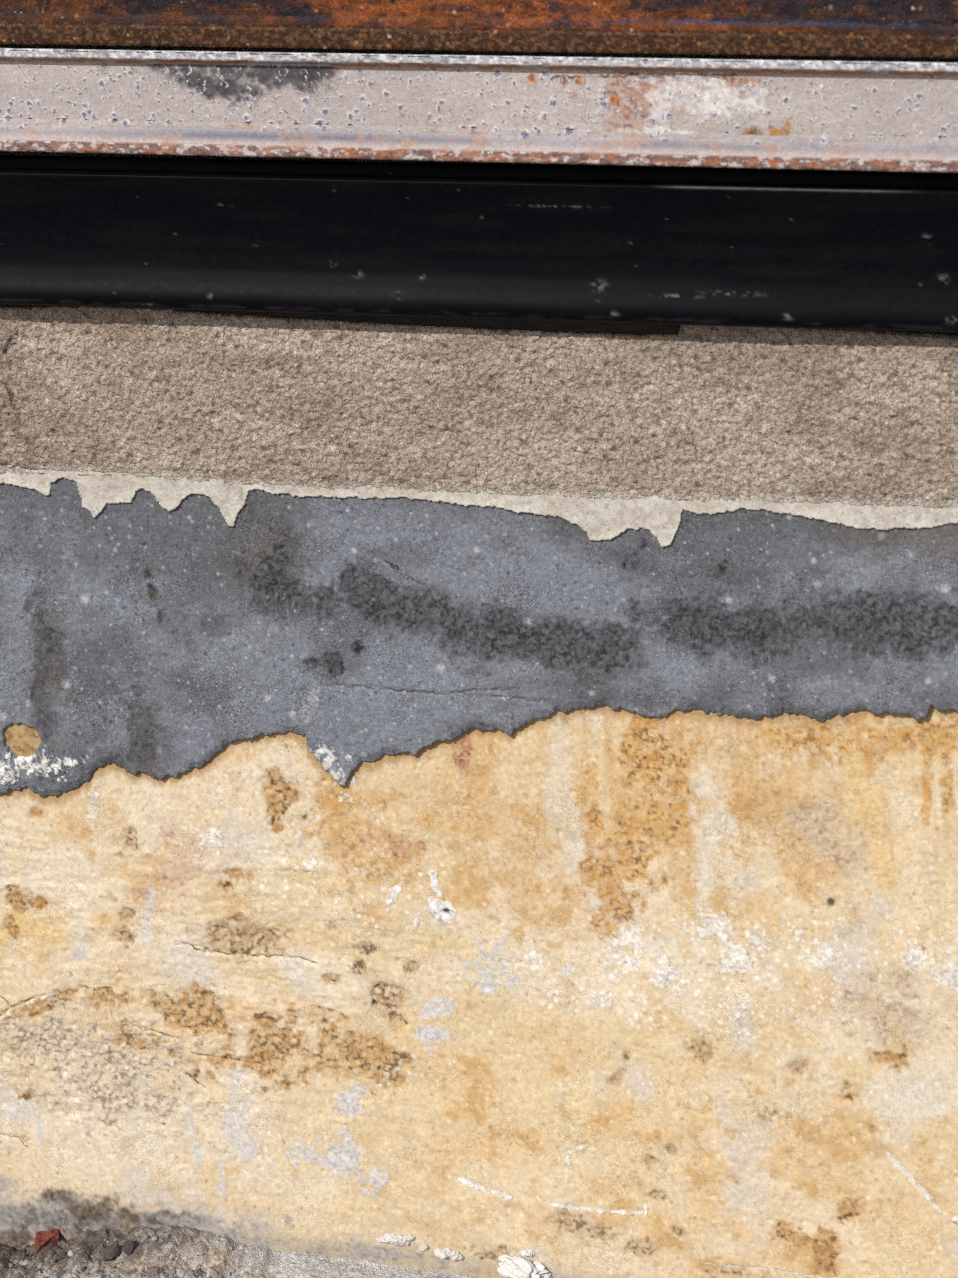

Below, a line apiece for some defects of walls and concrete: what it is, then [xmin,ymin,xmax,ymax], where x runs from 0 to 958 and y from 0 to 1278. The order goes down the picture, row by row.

crack [0,336,18,404]
crack [0,464,128,476]
peeling [77,485,248,528]
spalling [219,512,958,688]
efflorescence [0,748,79,793]
spalling [258,743,309,836]
damp [536,710,587,887]
damp [669,738,773,981]
damp [837,740,903,901]
spalling [1,879,52,945]
damp [787,920,838,974]
spalling [0,904,432,1151]